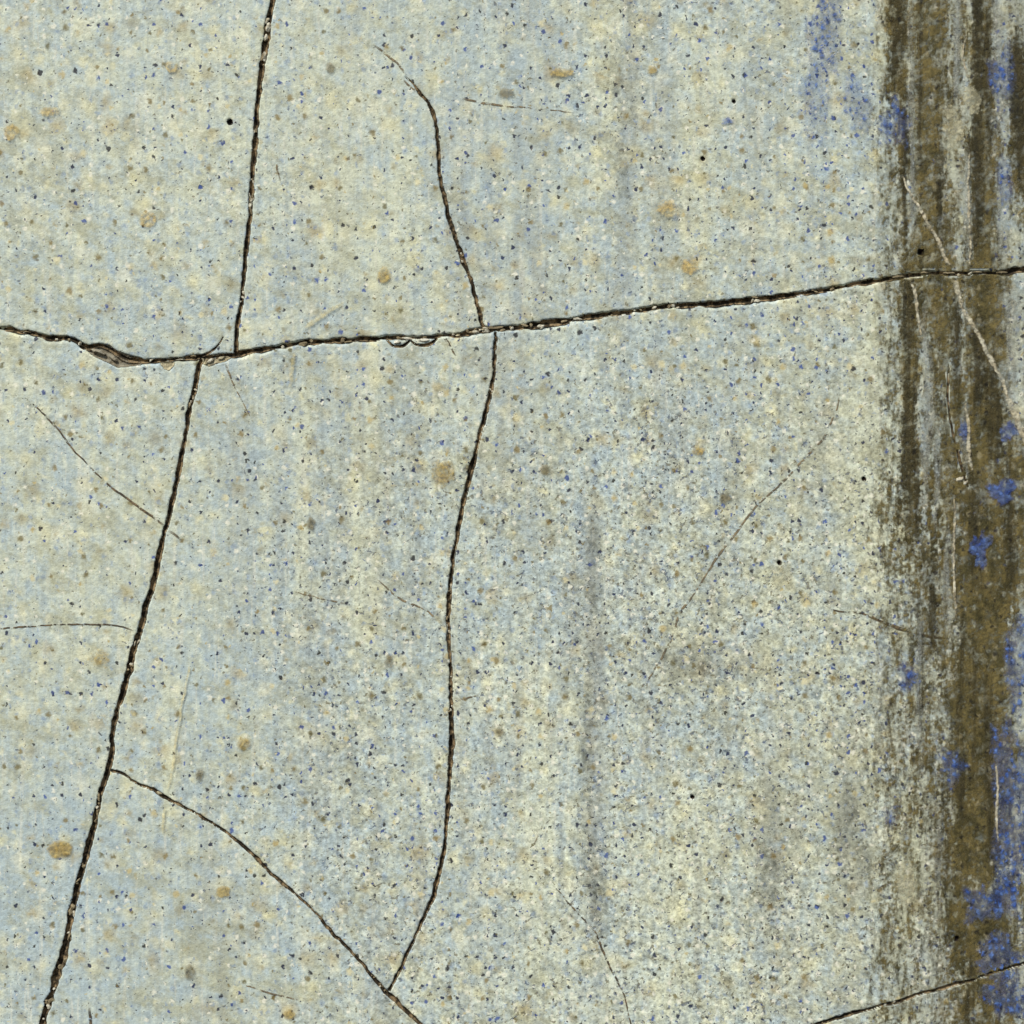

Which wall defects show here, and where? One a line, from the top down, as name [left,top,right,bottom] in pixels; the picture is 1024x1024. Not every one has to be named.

crack [0,0,1024,364]
crack [27,399,87,463]
crack [3,622,130,630]
crack [39,332,498,1024]
water stain [843,0,1024,1024]
crack [815,962,1024,1024]